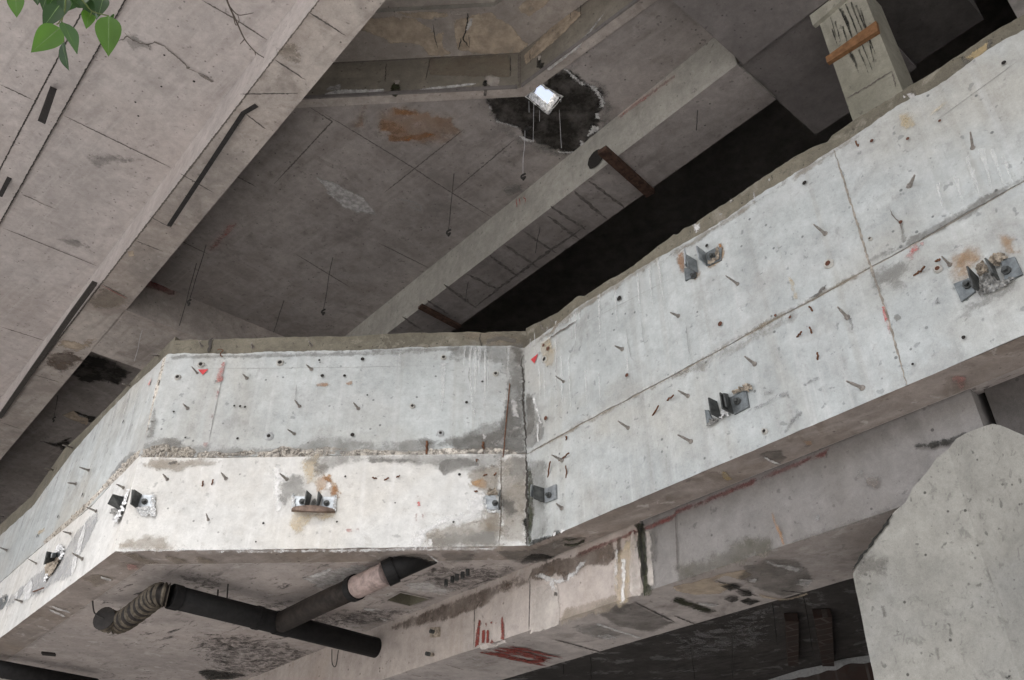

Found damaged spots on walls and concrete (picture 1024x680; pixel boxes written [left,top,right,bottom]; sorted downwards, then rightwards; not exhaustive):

crack [119,32,198,73]
corrosion [598,146,655,197]
peeling [538,562,585,596]